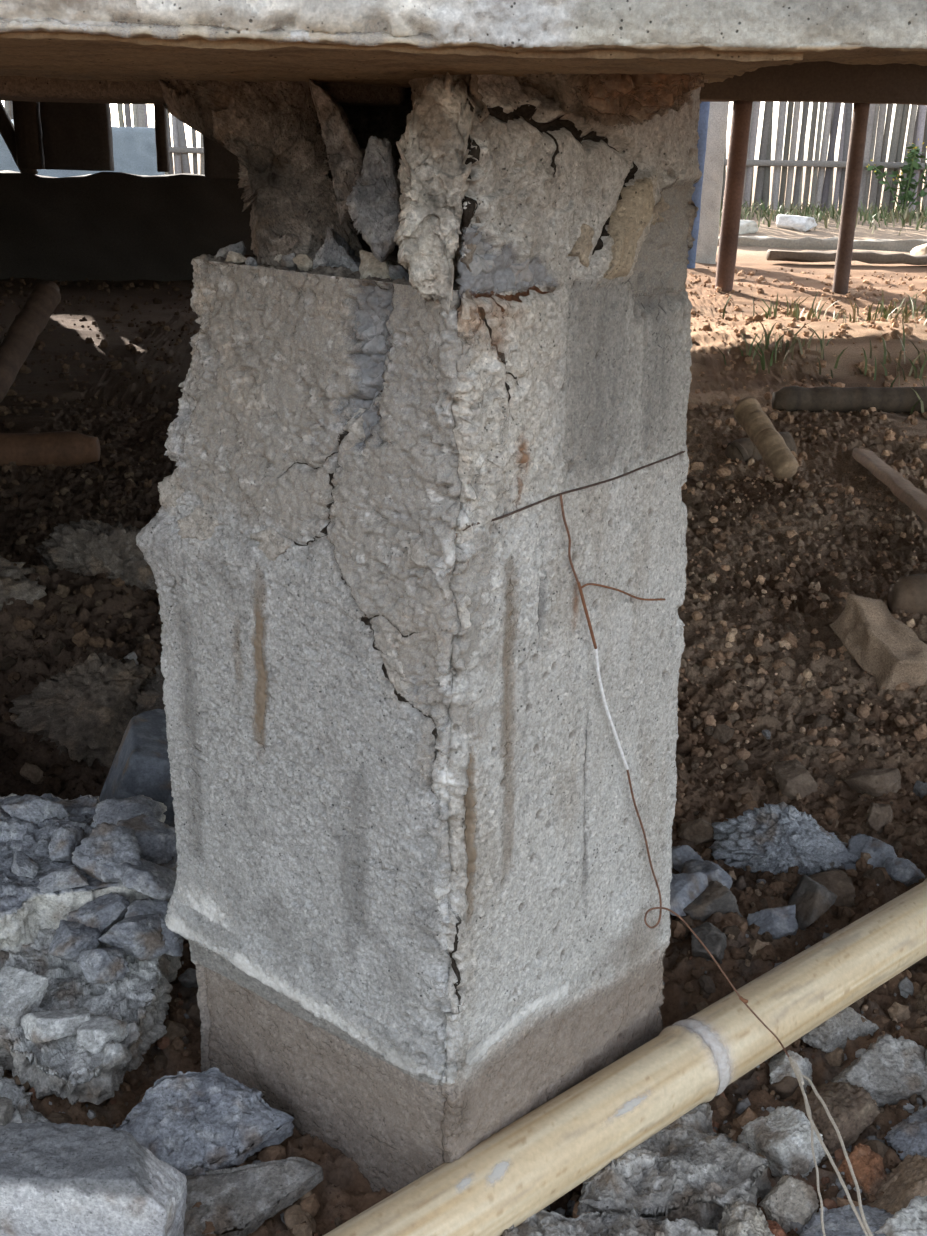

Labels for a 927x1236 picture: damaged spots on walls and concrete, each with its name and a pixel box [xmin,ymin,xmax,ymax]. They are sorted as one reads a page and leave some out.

crack [458,98,638,420]
peeling [568,177,695,297]
spalling [157,224,558,790]
crack [278,431,439,794]
water stain [439,510,472,570]
corrosion [518,442,529,465]
water stain [165,885,570,1086]
crack [448,899,462,1014]